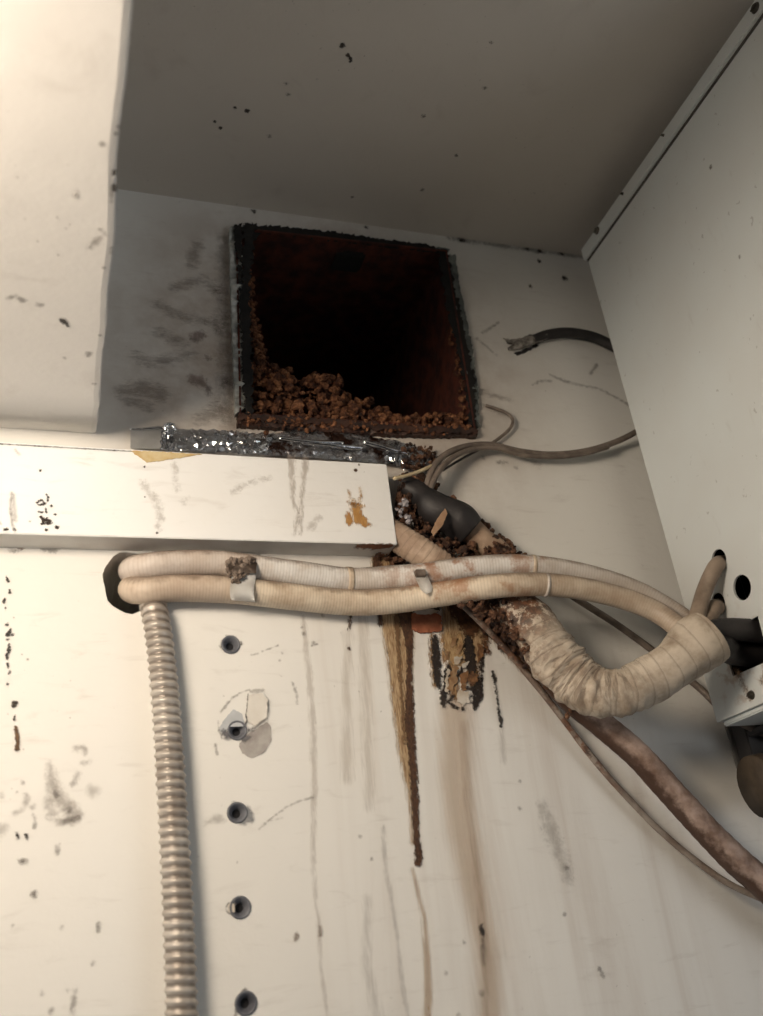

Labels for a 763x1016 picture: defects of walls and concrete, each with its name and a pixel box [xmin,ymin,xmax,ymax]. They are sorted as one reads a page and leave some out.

corrosion [345,493,371,527]
corrosion [355,543,403,567]
peeling [411,607,484,711]
corrosion [377,611,424,867]